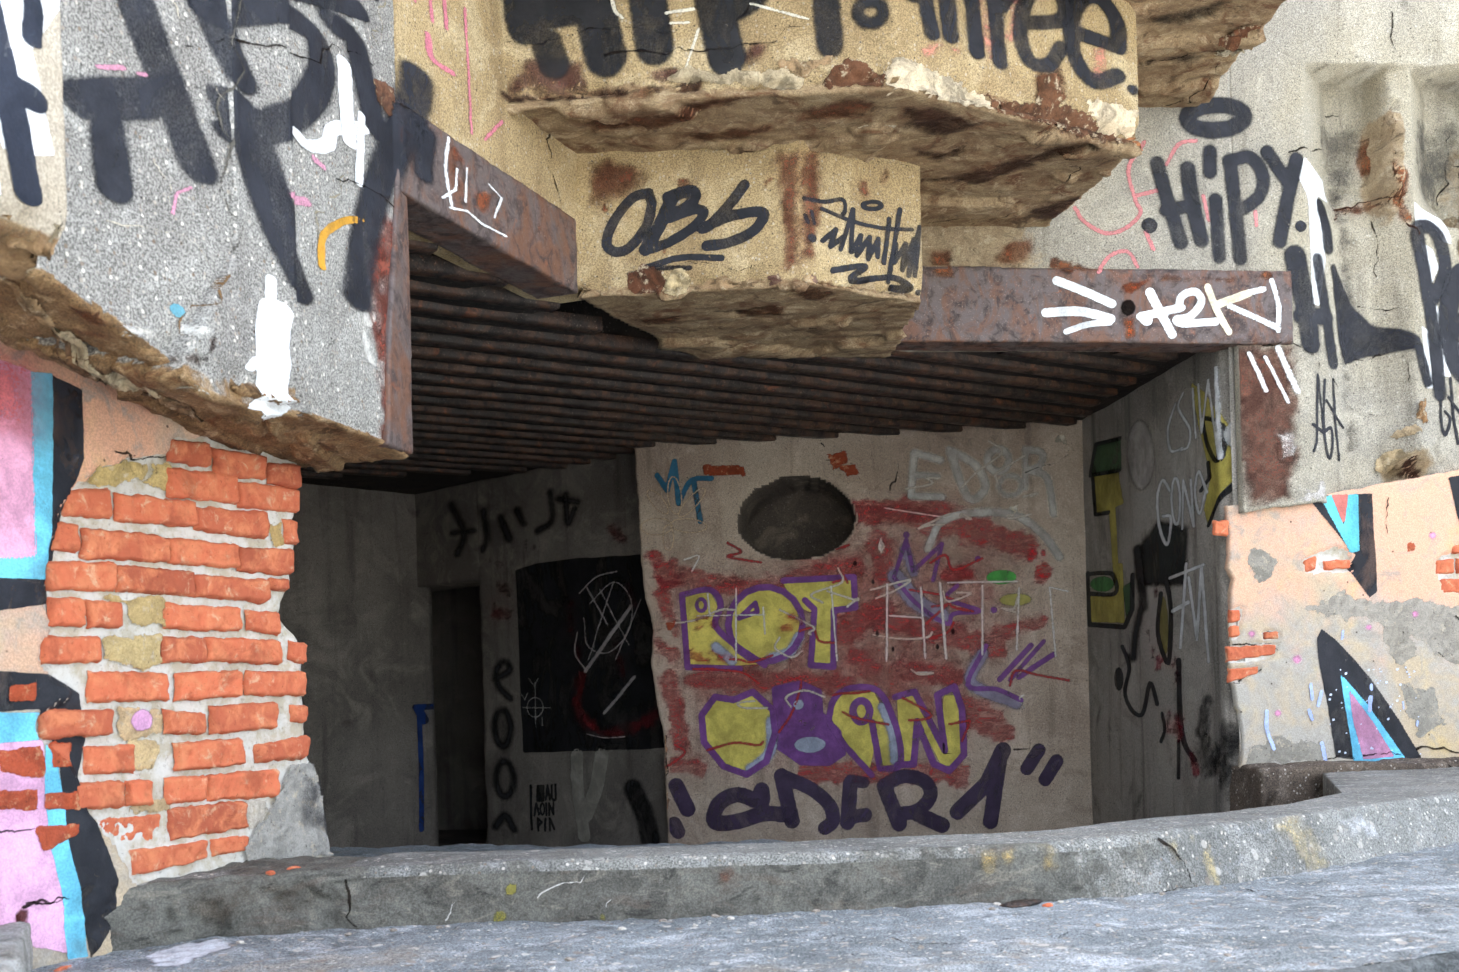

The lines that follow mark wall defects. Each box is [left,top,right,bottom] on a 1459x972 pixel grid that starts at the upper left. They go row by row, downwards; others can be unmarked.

spalling [667,55,1143,151]
rust [591,159,643,212]
rust [765,153,822,270]
rust [997,241,1032,264]
rust [1049,257,1087,274]
spalling [0,267,210,423]
rust [369,219,393,436]
rust [1238,340,1299,502]
flaking render [37,439,311,875]
flaking render [1225,610,1279,683]
peeling [1303,545,1459,665]
peeling [1246,736,1326,764]